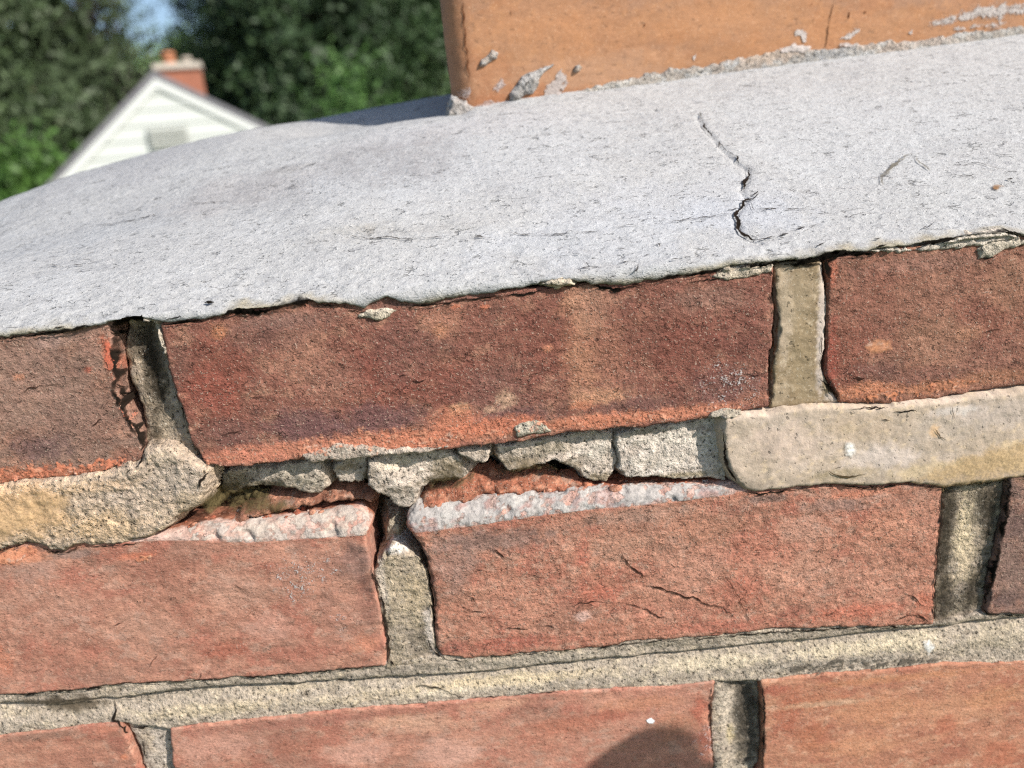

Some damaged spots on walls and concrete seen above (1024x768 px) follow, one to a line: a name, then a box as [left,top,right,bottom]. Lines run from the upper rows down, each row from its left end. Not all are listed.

crack [406,113,887,405]
crack [917,223,1024,259]
spalling [222,418,725,541]
crack [419,432,1023,662]